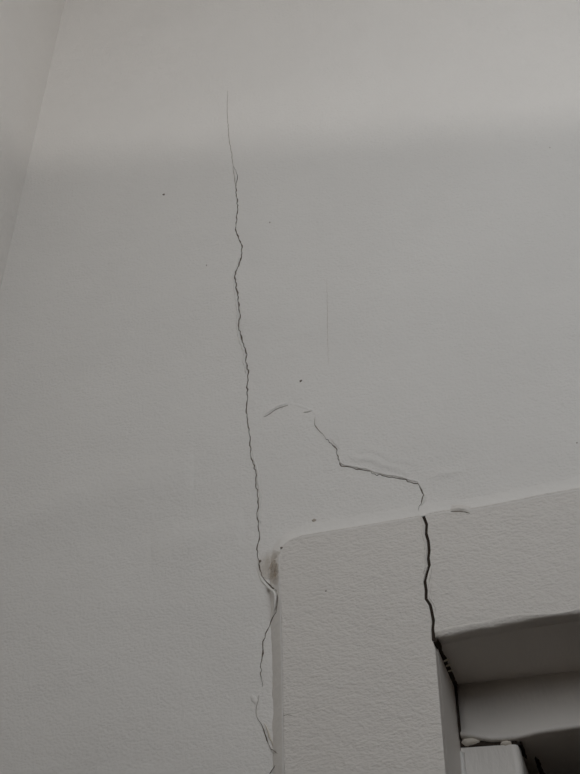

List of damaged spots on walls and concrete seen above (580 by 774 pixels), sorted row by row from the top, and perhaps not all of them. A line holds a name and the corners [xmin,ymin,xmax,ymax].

crack [227,91,278,773]
crack [314,420,545,774]